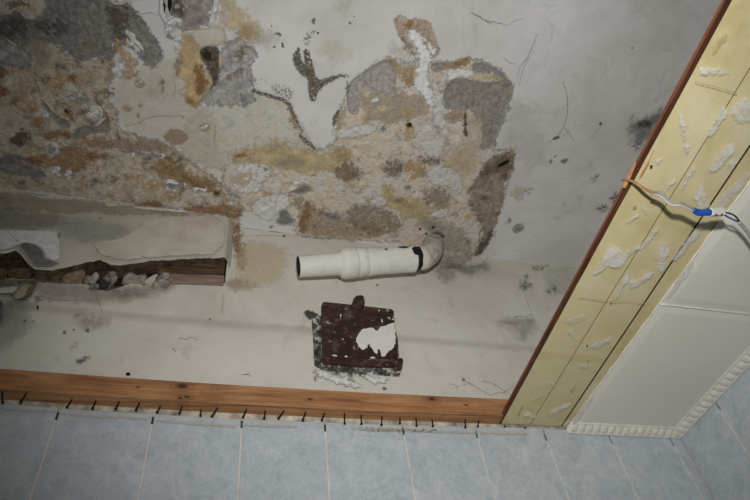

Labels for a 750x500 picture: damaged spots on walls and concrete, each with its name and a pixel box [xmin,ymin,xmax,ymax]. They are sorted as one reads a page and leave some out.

flaking render [0,0,524,269]
damp [635,114,660,138]